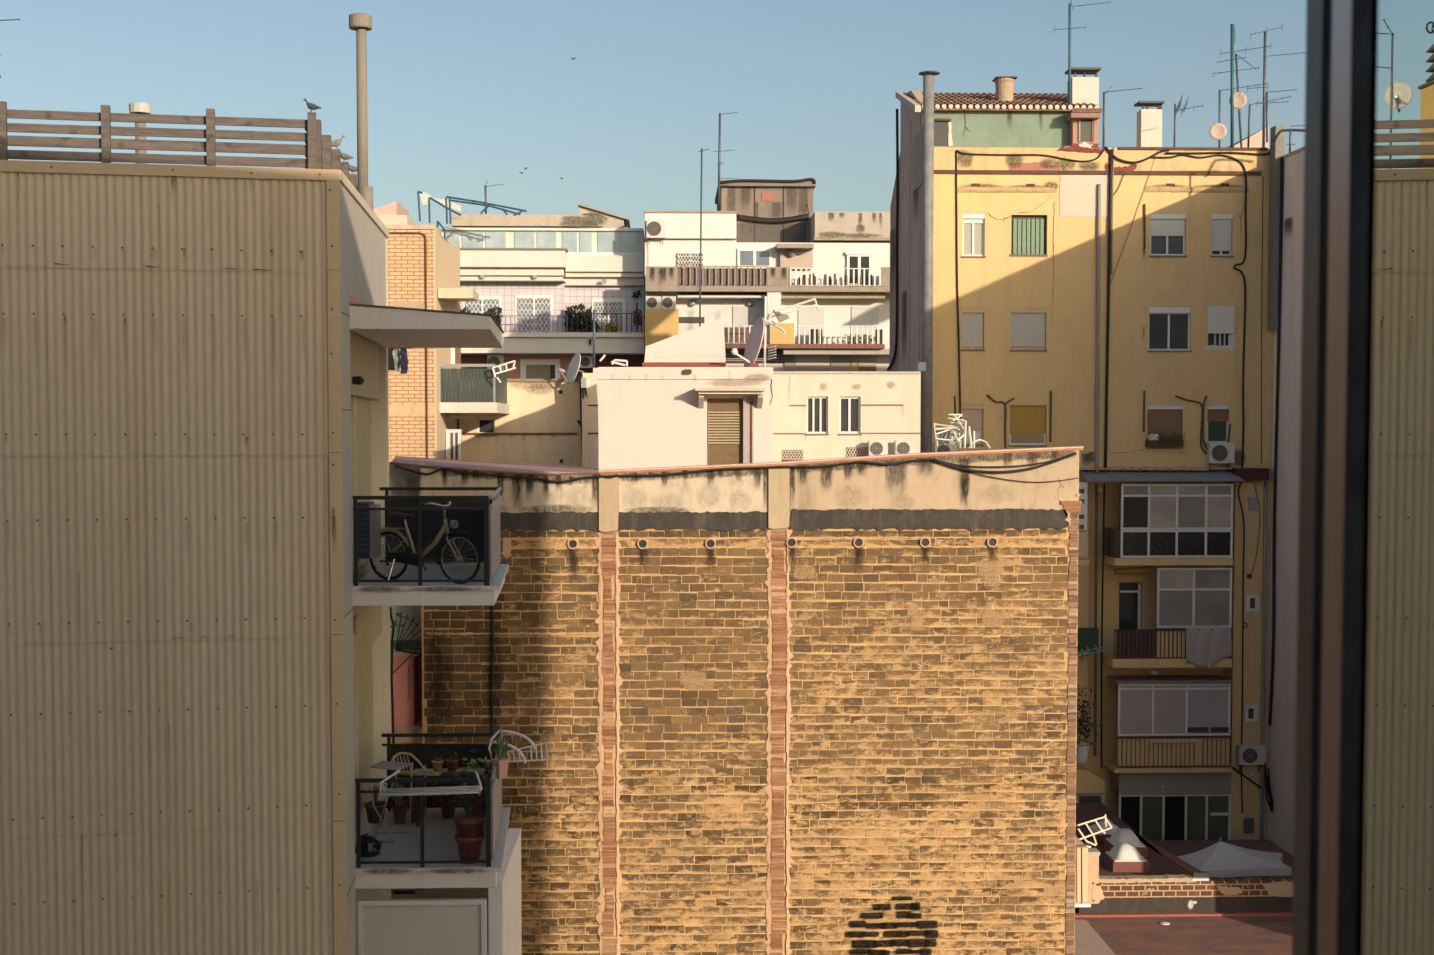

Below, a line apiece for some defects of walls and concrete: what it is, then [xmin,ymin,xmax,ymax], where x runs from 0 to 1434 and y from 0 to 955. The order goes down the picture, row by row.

leakage [442,470,598,513]
leakage [622,469,768,489]
leakage [790,451,1094,498]